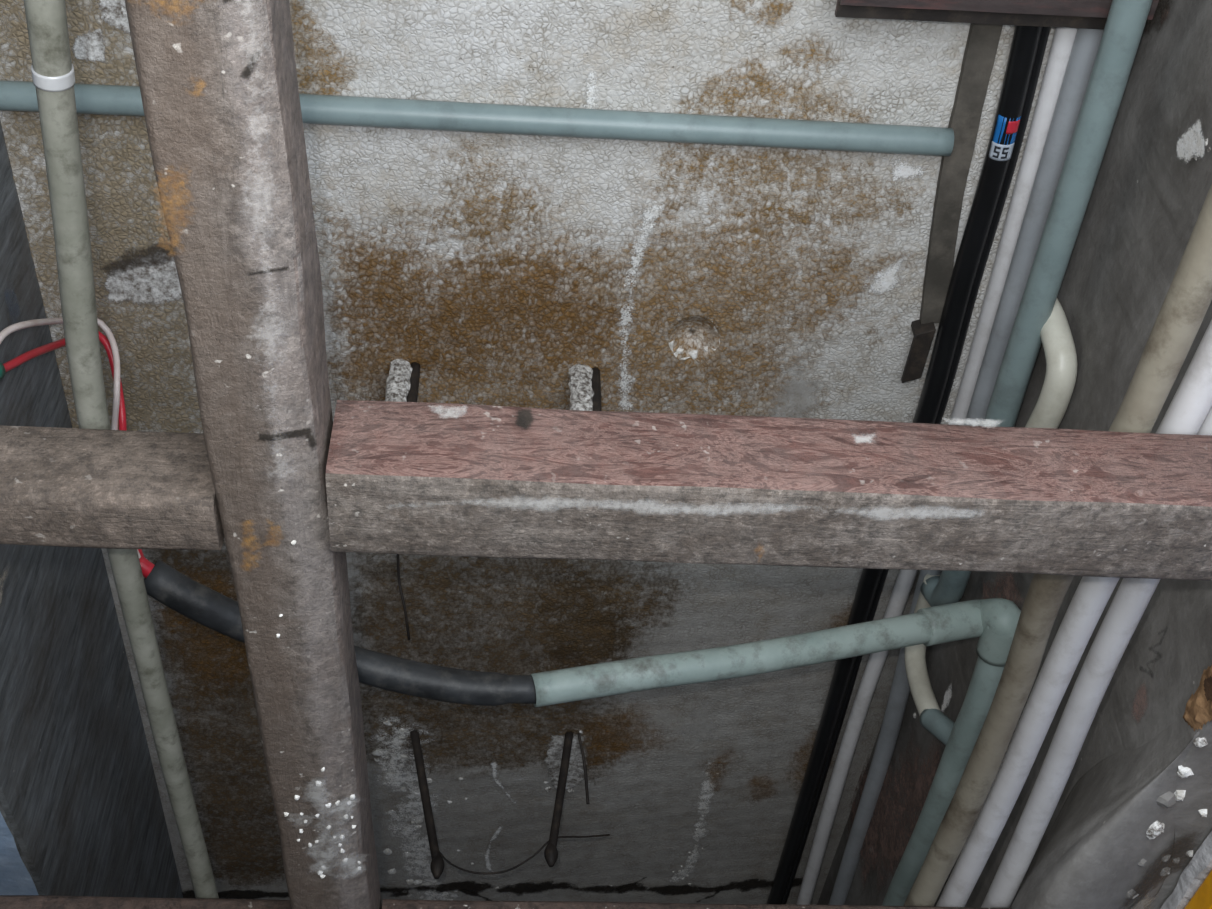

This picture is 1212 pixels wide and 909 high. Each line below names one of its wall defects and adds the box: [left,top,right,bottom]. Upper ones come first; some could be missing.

leakage [732,0,793,25]
leakage [584,71,598,109]
leakage [688,38,869,122]
leakage [327,141,911,418]
leakage [352,553,683,675]
leakage [360,685,658,803]
leakage [670,756,727,883]
crack [182,890,289,899]
crack [380,877,803,902]